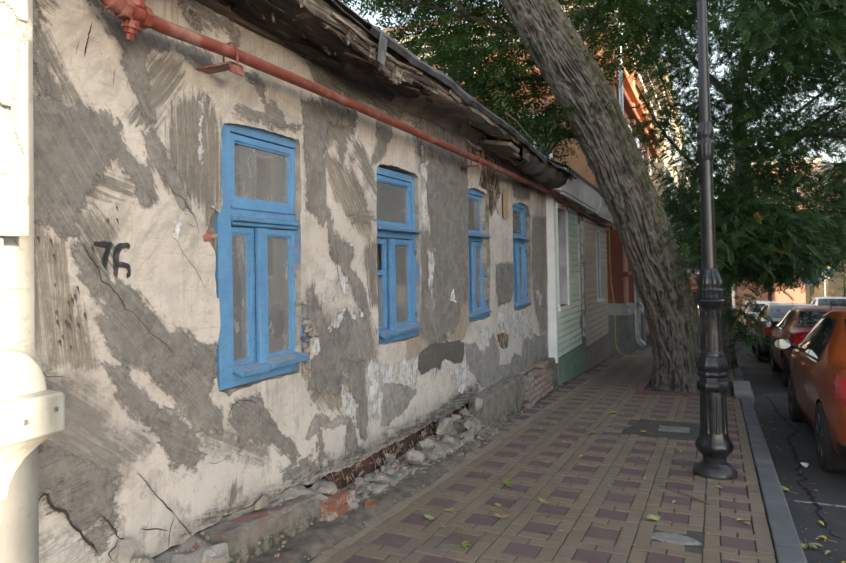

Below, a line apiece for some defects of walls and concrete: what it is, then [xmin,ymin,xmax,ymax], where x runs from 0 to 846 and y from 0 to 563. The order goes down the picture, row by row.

flaking render [0,2,33,167]
crack [82,243,176,356]
peeling [340,384,355,415]
peeling [368,303,470,421]
peeling [427,249,435,297]
peeling [479,325,508,349]
crack [39,493,125,561]
crack [137,472,192,550]